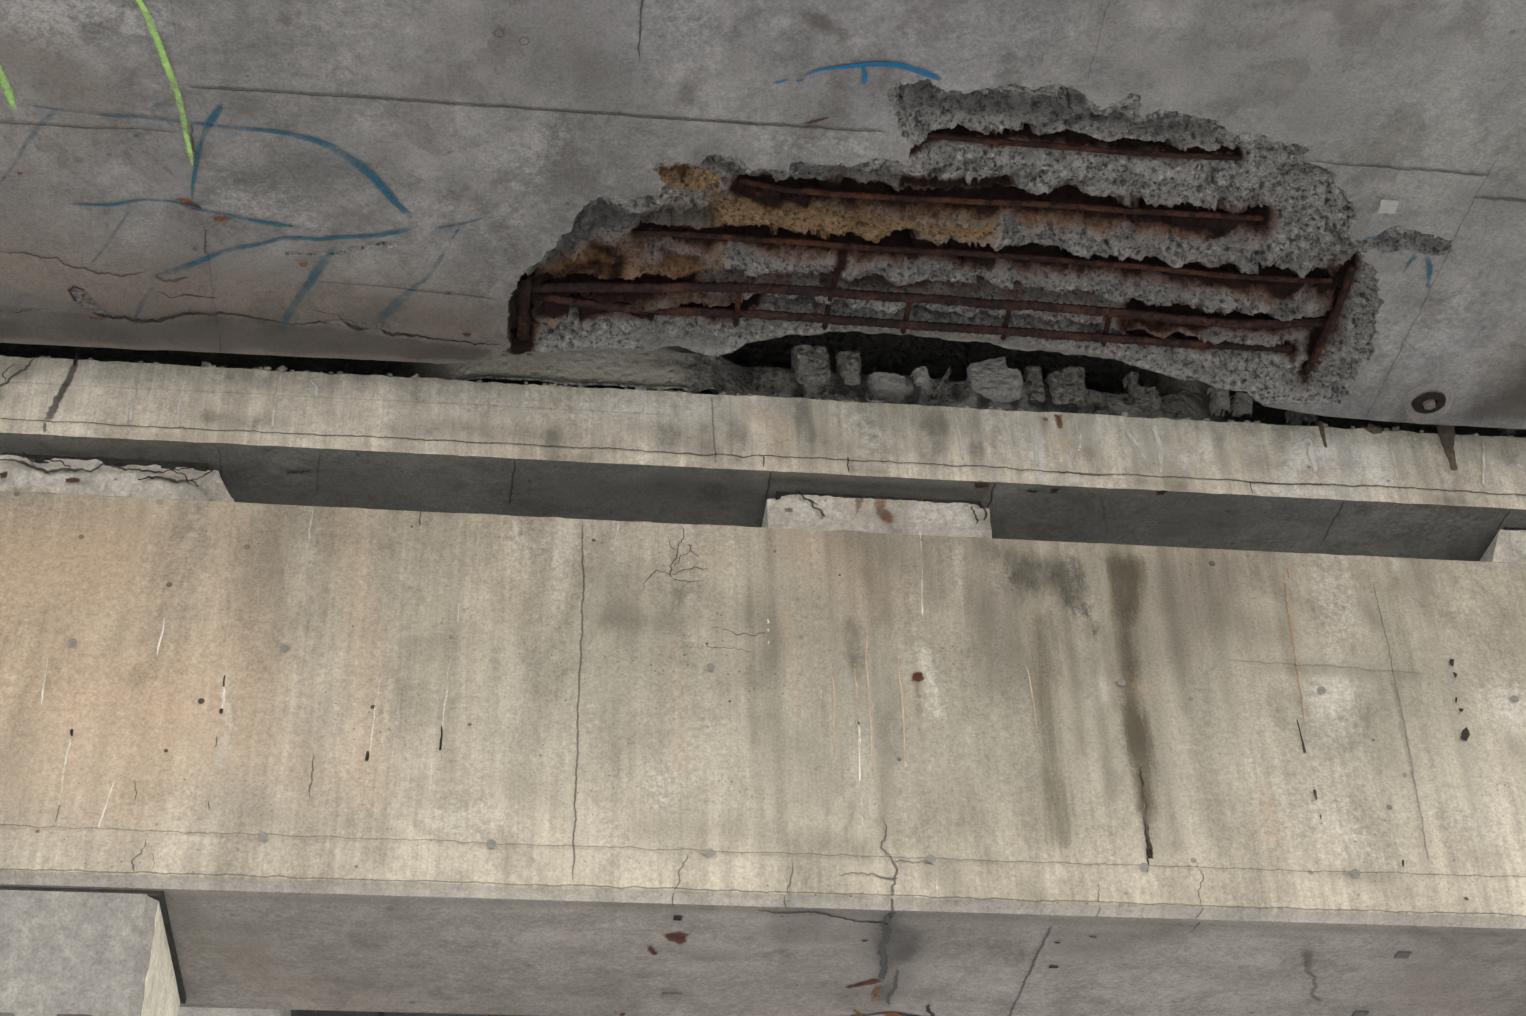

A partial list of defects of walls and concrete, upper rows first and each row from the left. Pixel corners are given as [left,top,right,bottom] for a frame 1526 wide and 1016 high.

crack [187,124,196,169]
crack [0,230,499,345]
spalling [490,78,1454,426]
crack [0,351,1526,517]
damp [1022,560,1086,608]
damp [854,633,874,825]
damp [1110,558,1152,819]
rust [648,915,688,955]
crack [758,819,935,1016]